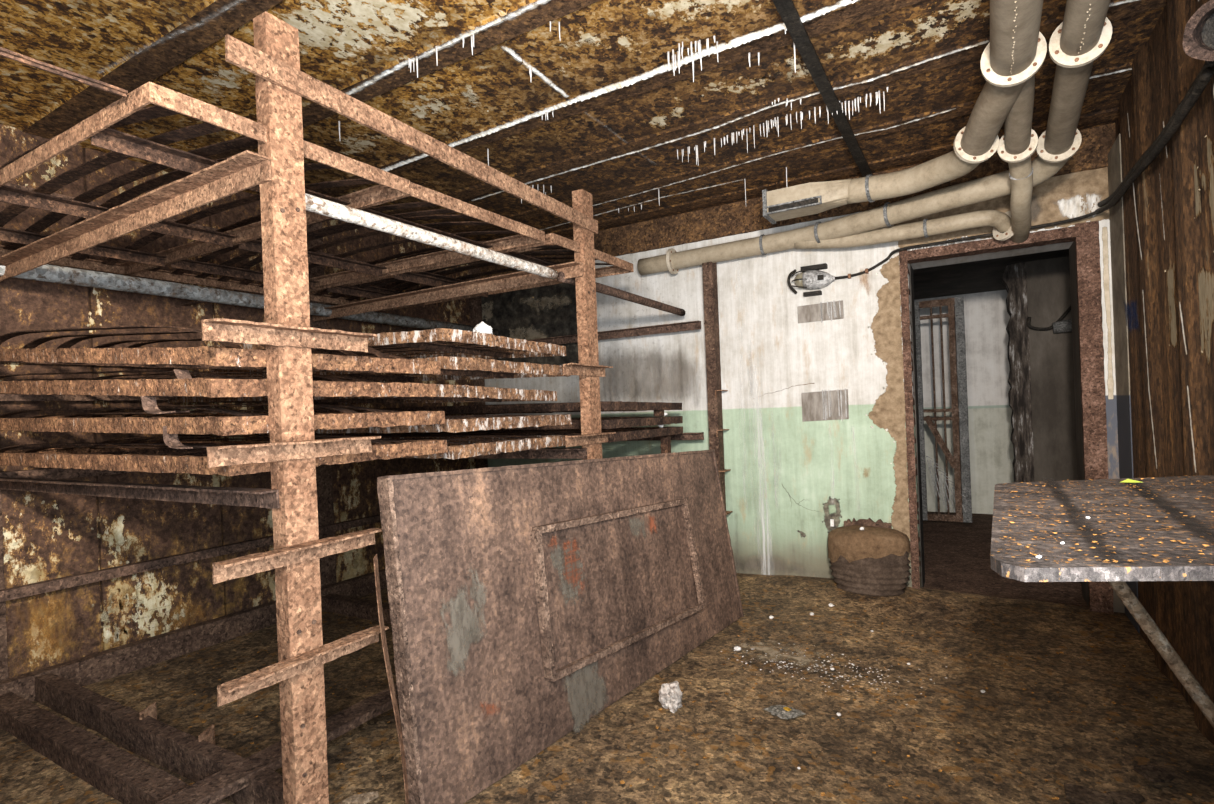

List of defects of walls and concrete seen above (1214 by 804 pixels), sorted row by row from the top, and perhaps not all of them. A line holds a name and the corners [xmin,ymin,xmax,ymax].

water stain [381,154,429,172]
water stain [346,0,550,95]
water stain [449,23,796,166]
water stain [521,41,987,216]
water stain [800,0,859,22]
peeling [894,194,1011,226]
peeling [1194,135,1214,252]
peeling [1030,167,1114,399]
peeling [1164,263,1179,347]
peeling [1198,267,1214,366]
peeling [866,226,994,579]